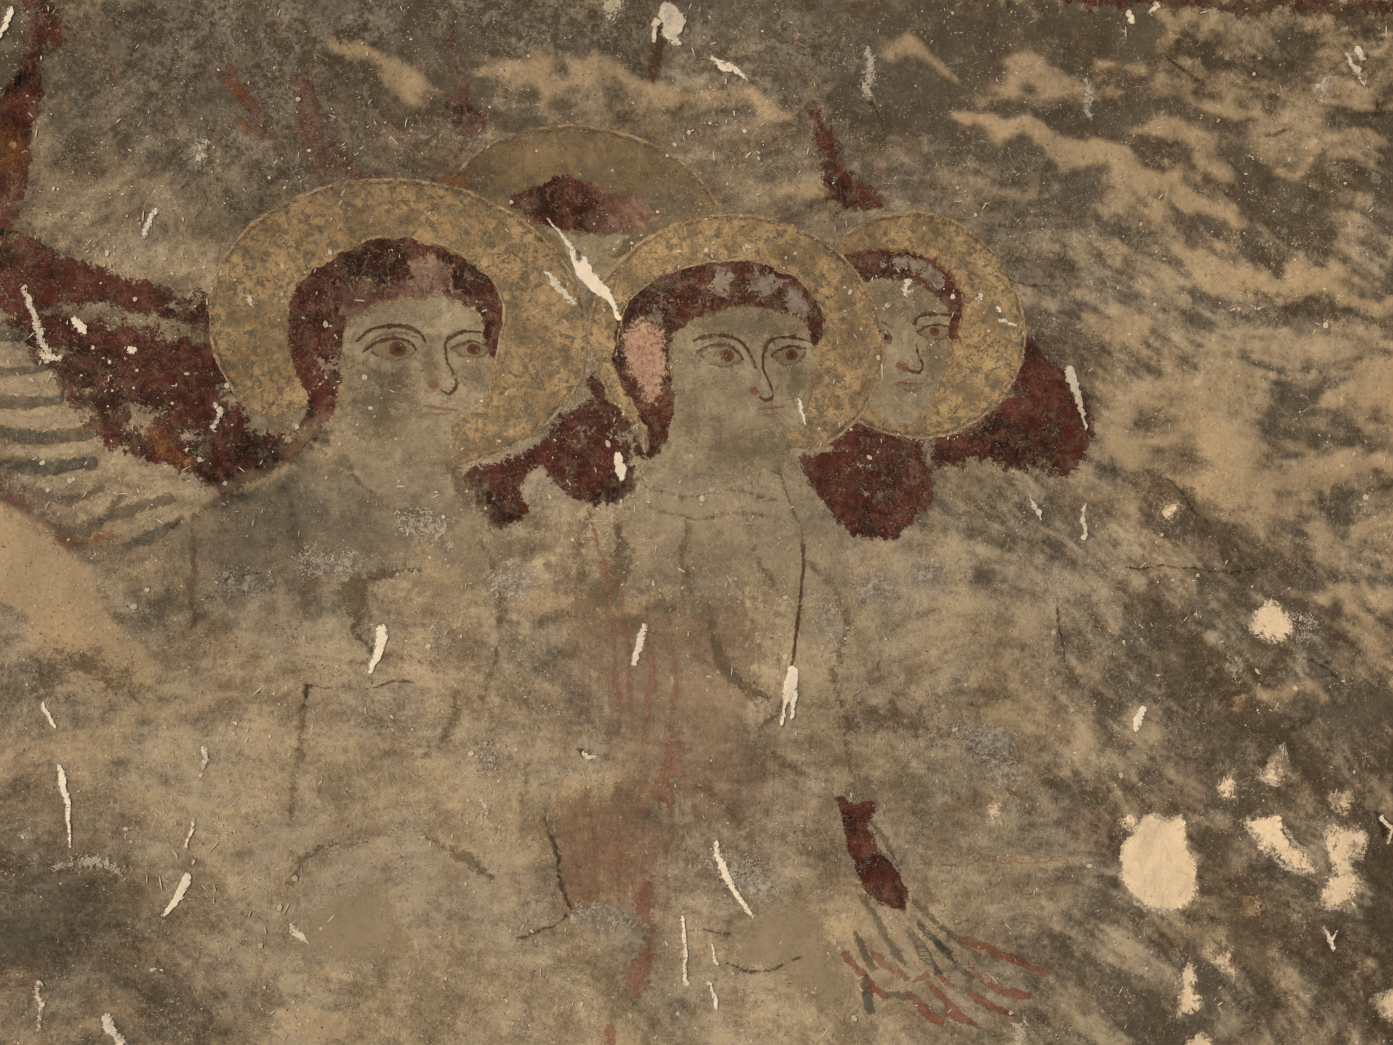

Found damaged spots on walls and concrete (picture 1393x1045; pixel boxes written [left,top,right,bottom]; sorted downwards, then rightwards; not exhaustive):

flaking render [1248,599,1294,646]
flaking render [1118,811,1199,915]
flaking render [1238,789,1393,911]
flaking render [704,845,857,1023]
flaking render [1175,947,1240,1019]
flaking render [1368,989,1393,1024]